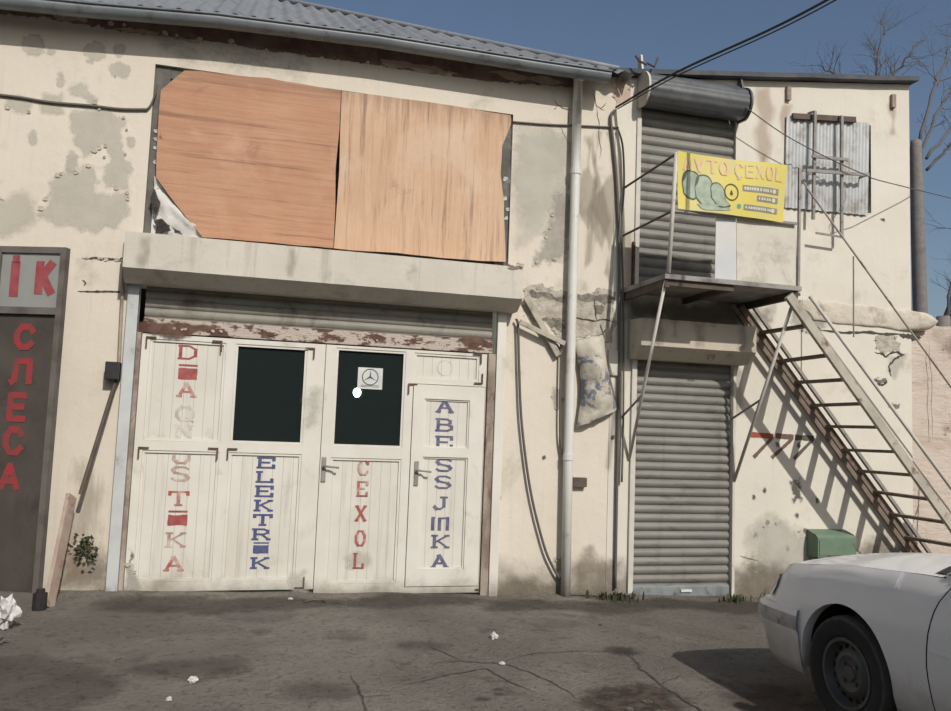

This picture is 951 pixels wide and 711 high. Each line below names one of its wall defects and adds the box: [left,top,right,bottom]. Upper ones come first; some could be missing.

peeling [0,9,573,87]
peeling [0,74,134,234]
rust [137,321,223,338]
rust [457,335,492,348]
flaking render [521,283,617,343]
flaking render [874,335,905,386]